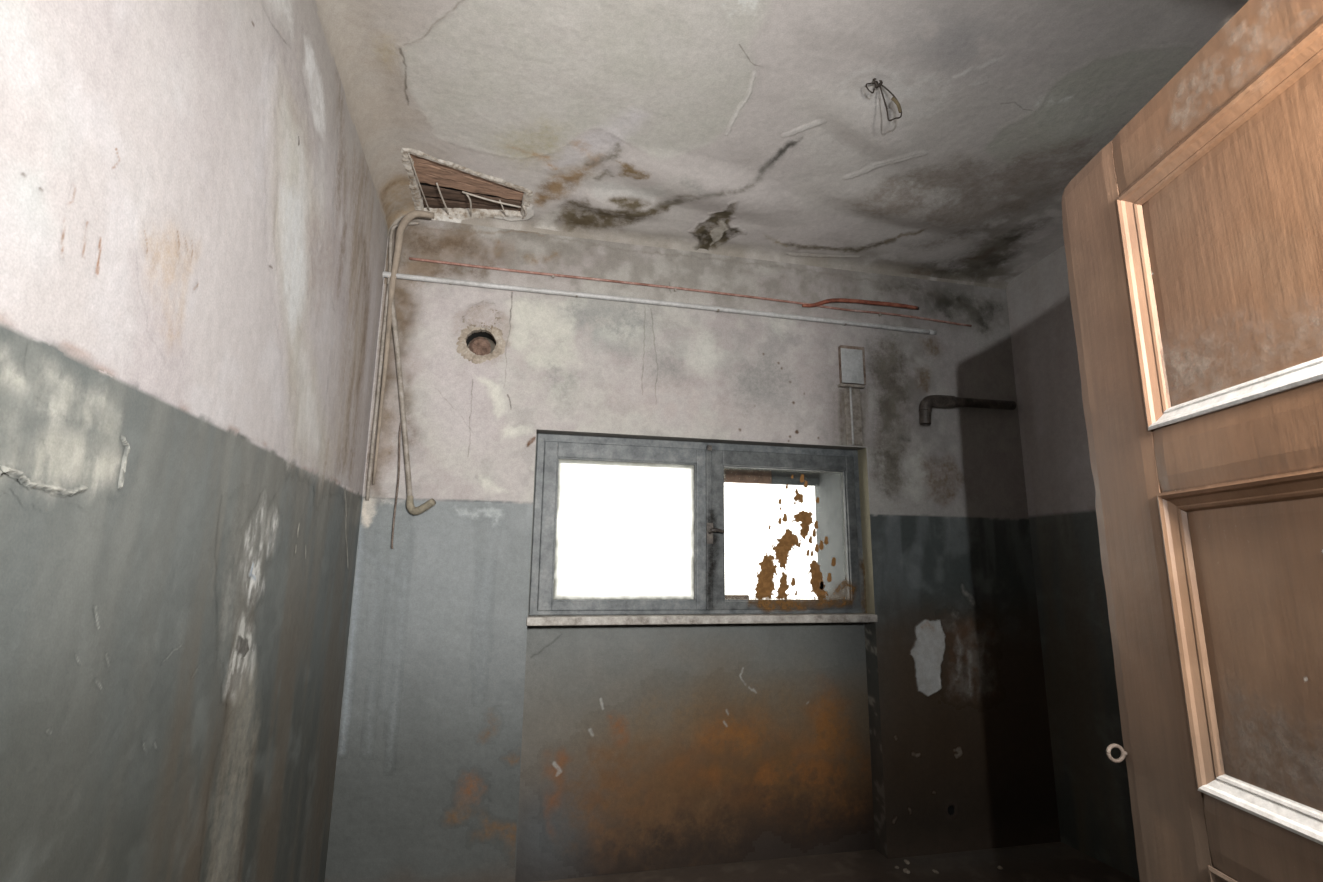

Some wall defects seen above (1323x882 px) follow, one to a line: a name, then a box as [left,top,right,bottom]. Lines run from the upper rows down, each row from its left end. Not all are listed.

peeling [398,0,780,223]
peeling [0,329,132,514]
damp [262,25,828,514]
spalling [687,199,749,251]
damp [761,111,1139,513]
damp [198,483,283,882]
corrosion [520,661,874,878]
peeling [909,617,945,698]